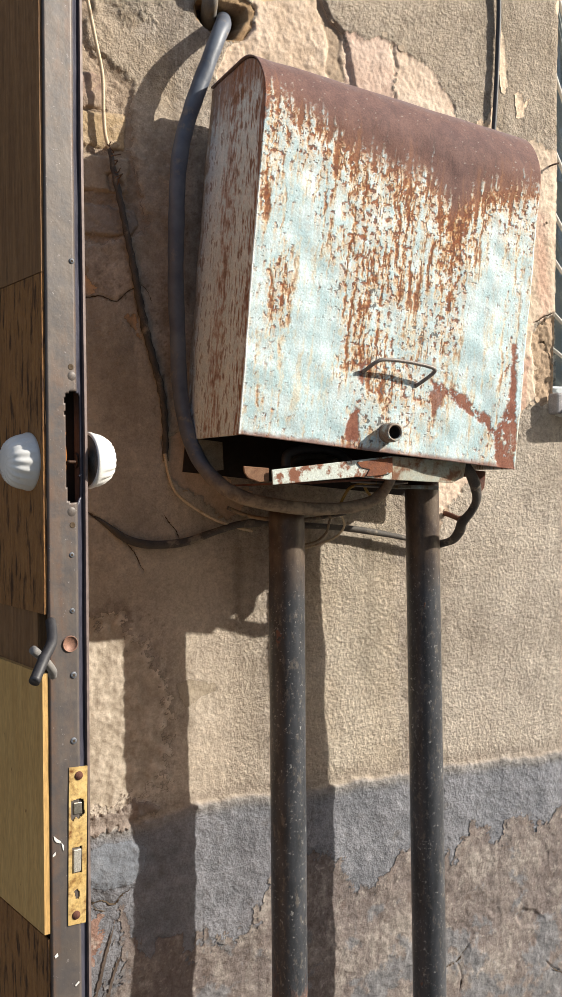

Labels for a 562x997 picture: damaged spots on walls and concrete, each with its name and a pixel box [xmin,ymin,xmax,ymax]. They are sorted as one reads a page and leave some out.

flaking render [82,0,150,245]
spalling [193,0,202,23]
peeling [216,0,503,132]
spalling [499,28,530,119]
peeling [520,138,557,418]
peeling [439,477,468,531]
peeling [89,610,216,838]
peeling [91,876,272,997]
peeling [307,845,413,997]